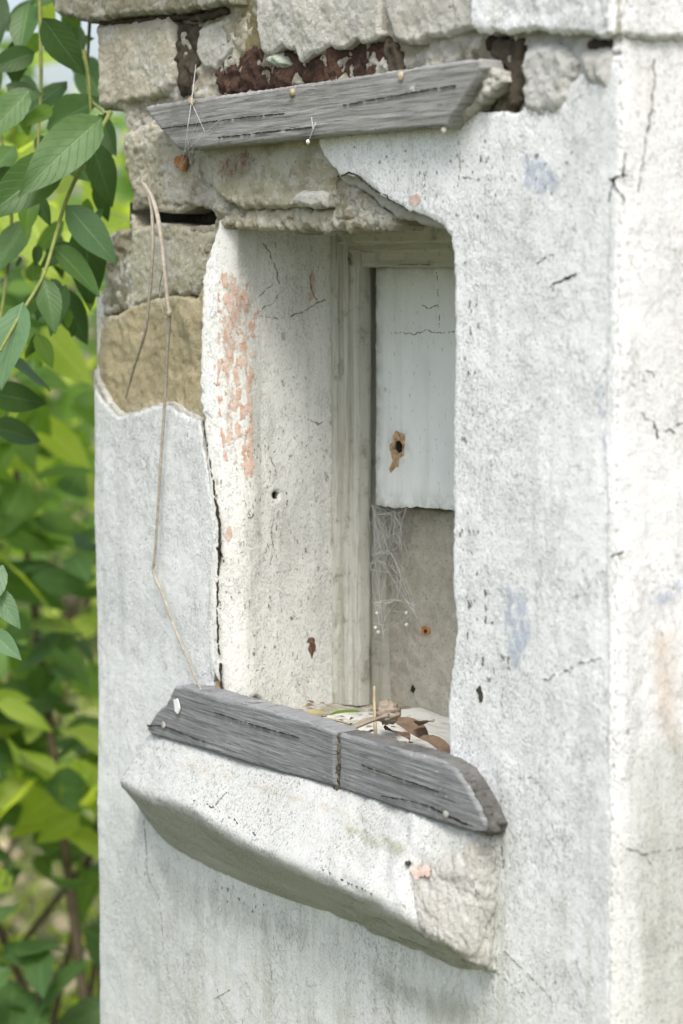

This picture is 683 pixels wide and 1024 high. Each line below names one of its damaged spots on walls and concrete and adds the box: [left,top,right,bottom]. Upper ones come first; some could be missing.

spalling [54,0,683,485]
crack [337,172,409,211]
crack [203,420,274,689]
rust [307,637,316,658]
crack [537,59,683,1024]